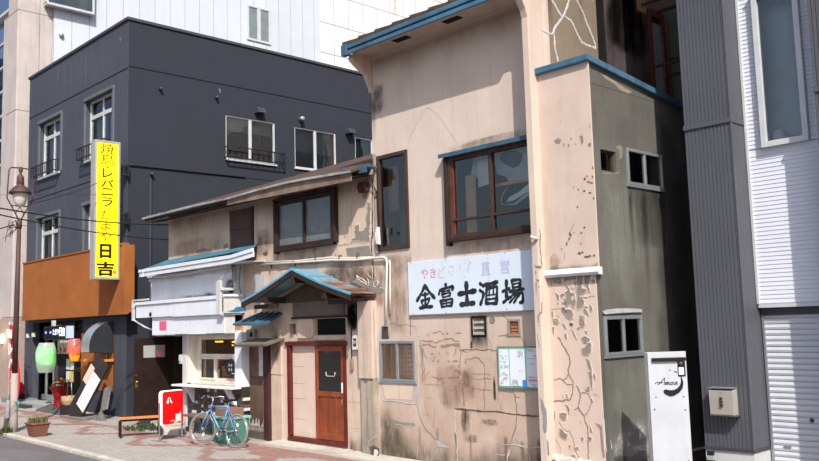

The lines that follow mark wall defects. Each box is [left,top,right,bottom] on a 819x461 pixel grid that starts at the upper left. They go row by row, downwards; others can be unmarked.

peeling [344,201,372,243]
crack [336,177,612,461]
peeling [534,264,597,403]